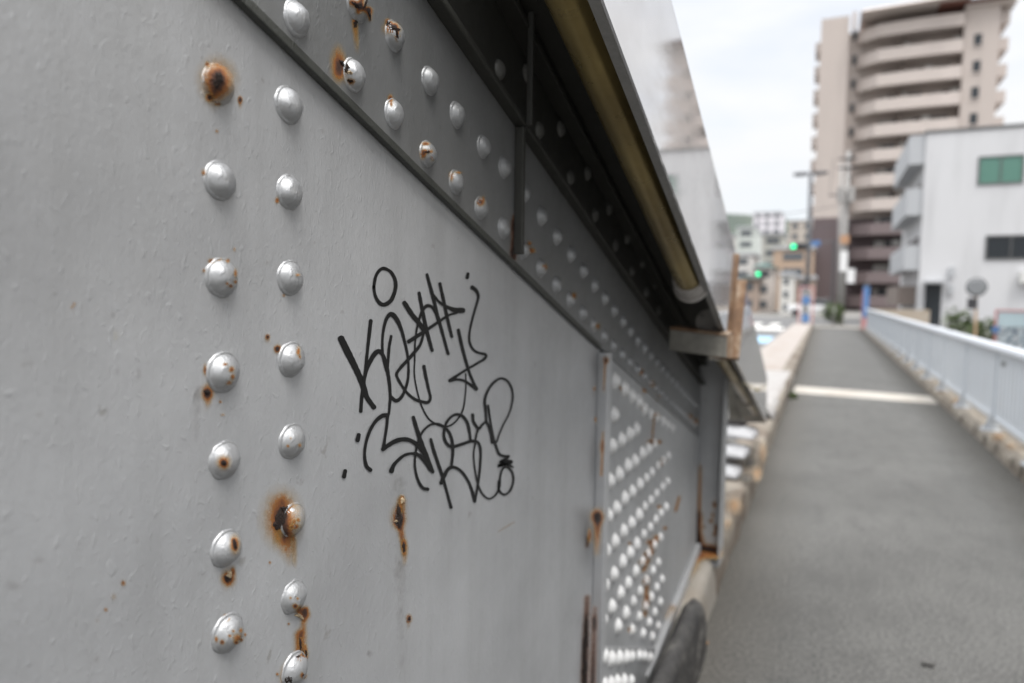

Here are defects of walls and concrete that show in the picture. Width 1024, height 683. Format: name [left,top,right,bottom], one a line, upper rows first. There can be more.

corrosion [204,62,243,105]
corrosion [333,51,355,84]
corrosion [202,366,223,415]
corrosion [268,494,300,553]
corrosion [393,496,407,557]
corrosion [276,597,310,683]
corrosion [581,597,597,683]